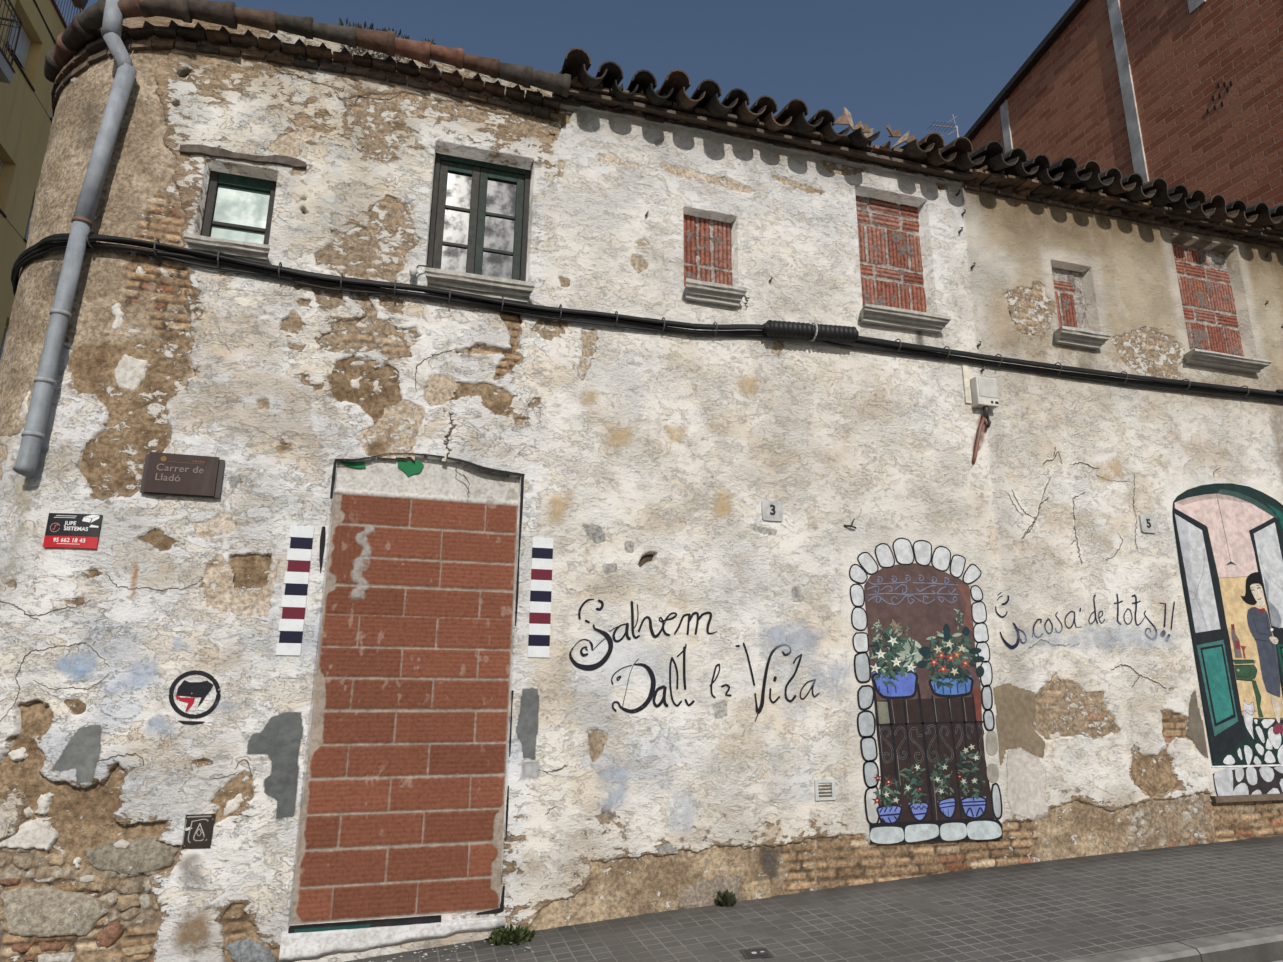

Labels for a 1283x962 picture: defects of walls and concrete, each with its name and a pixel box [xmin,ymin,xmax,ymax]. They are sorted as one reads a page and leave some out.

spalling [0,40,201,499]
spalling [280,196,562,460]
spalling [1005,282,1055,338]
spalling [1112,327,1184,380]
crack [1008,447,1138,564]
peeling [203,554,280,618]
spalling [66,699,86,715]
spalling [1033,674,1118,740]
spalling [211,771,254,824]
spalling [529,709,1283,931]